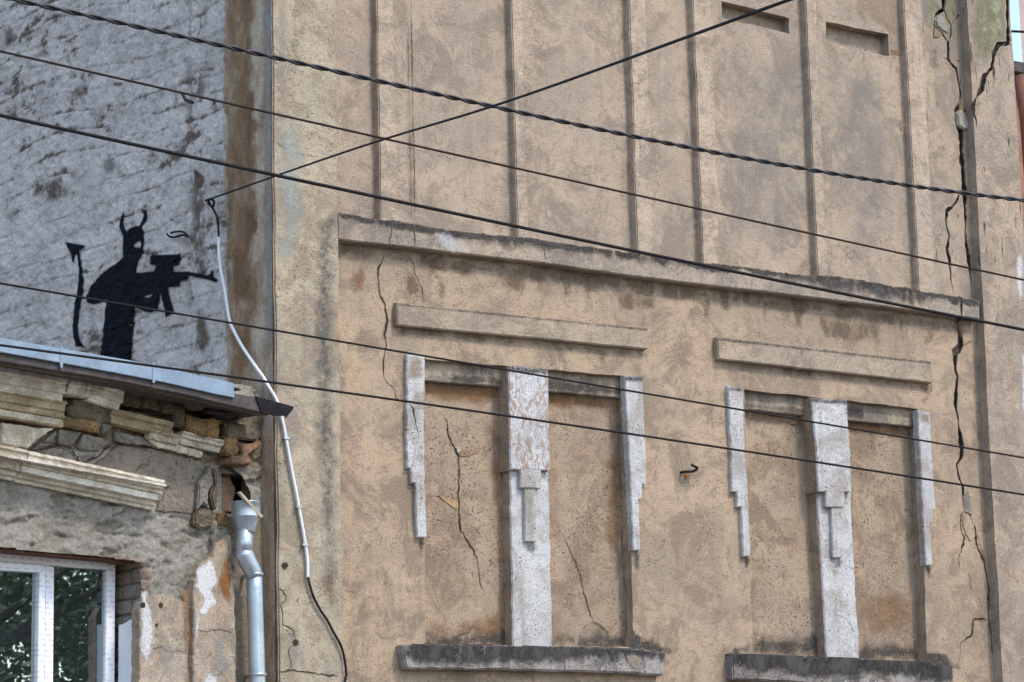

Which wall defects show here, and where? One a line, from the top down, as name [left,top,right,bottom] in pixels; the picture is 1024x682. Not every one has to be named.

crack [377,7,424,434]
leakage [420,234,474,274]
leakage [505,268,903,339]
crack [935,0,1010,654]
crack [430,418,483,589]
peeling [141,592,153,660]
peeling [196,560,218,635]
crack [565,539,593,620]